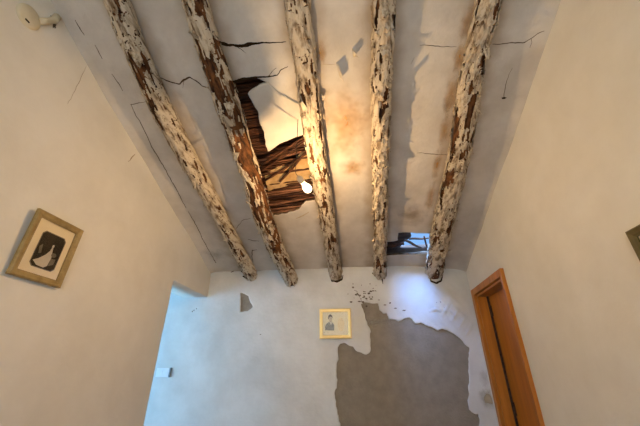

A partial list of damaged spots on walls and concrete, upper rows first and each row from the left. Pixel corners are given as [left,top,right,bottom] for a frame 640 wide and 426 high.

crack [219,41,286,51]
crack [495,31,543,46]
crack [160,77,206,88]
peeling [181,0,298,288]
crack [131,102,216,263]
flaking render [335,0,480,426]
flaking render [241,293,253,312]